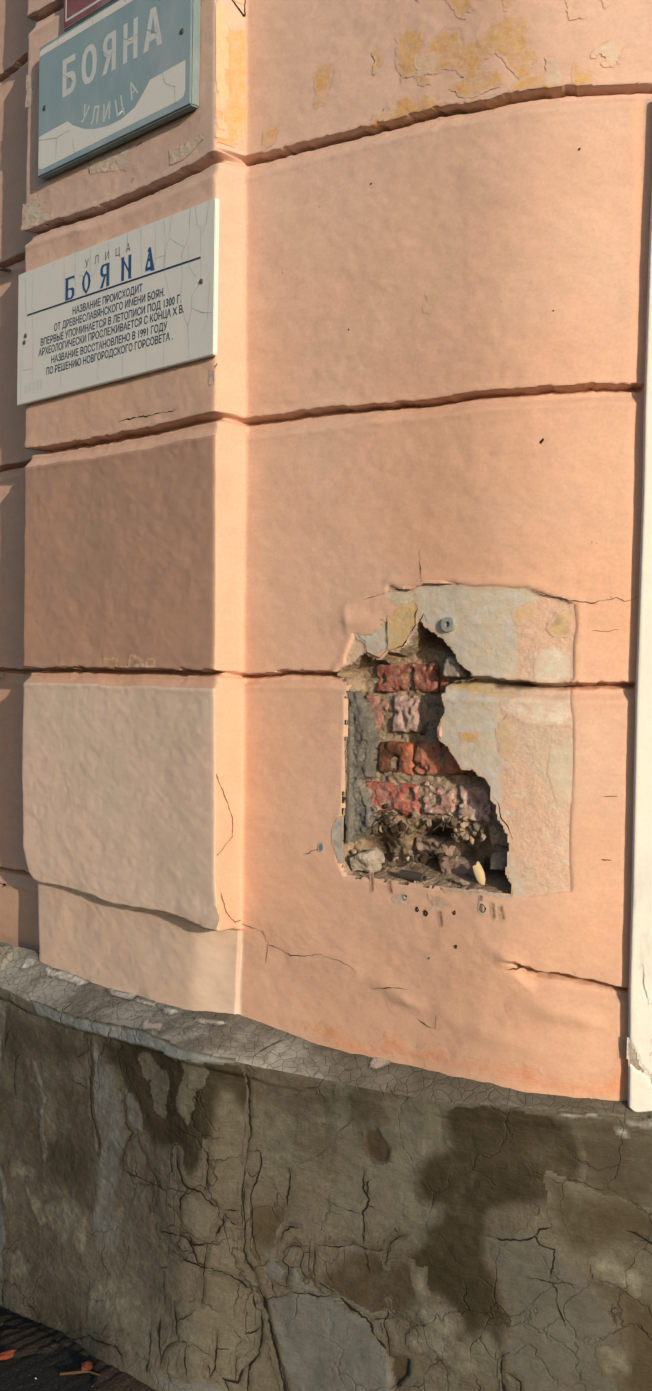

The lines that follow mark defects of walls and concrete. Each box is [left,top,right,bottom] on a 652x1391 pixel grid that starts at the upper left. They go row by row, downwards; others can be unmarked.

peeling [313,61,333,109]
peeling [349,0,628,136]
peeling [331,579,576,915]
peeling [627,1038,652,1084]
peeling [558,1112,652,1139]
crack [0,1000,411,1391]
leakage [320,1104,652,1391]
crack [483,1228,578,1326]
crack [628,1231,652,1245]
crack [496,1348,528,1391]